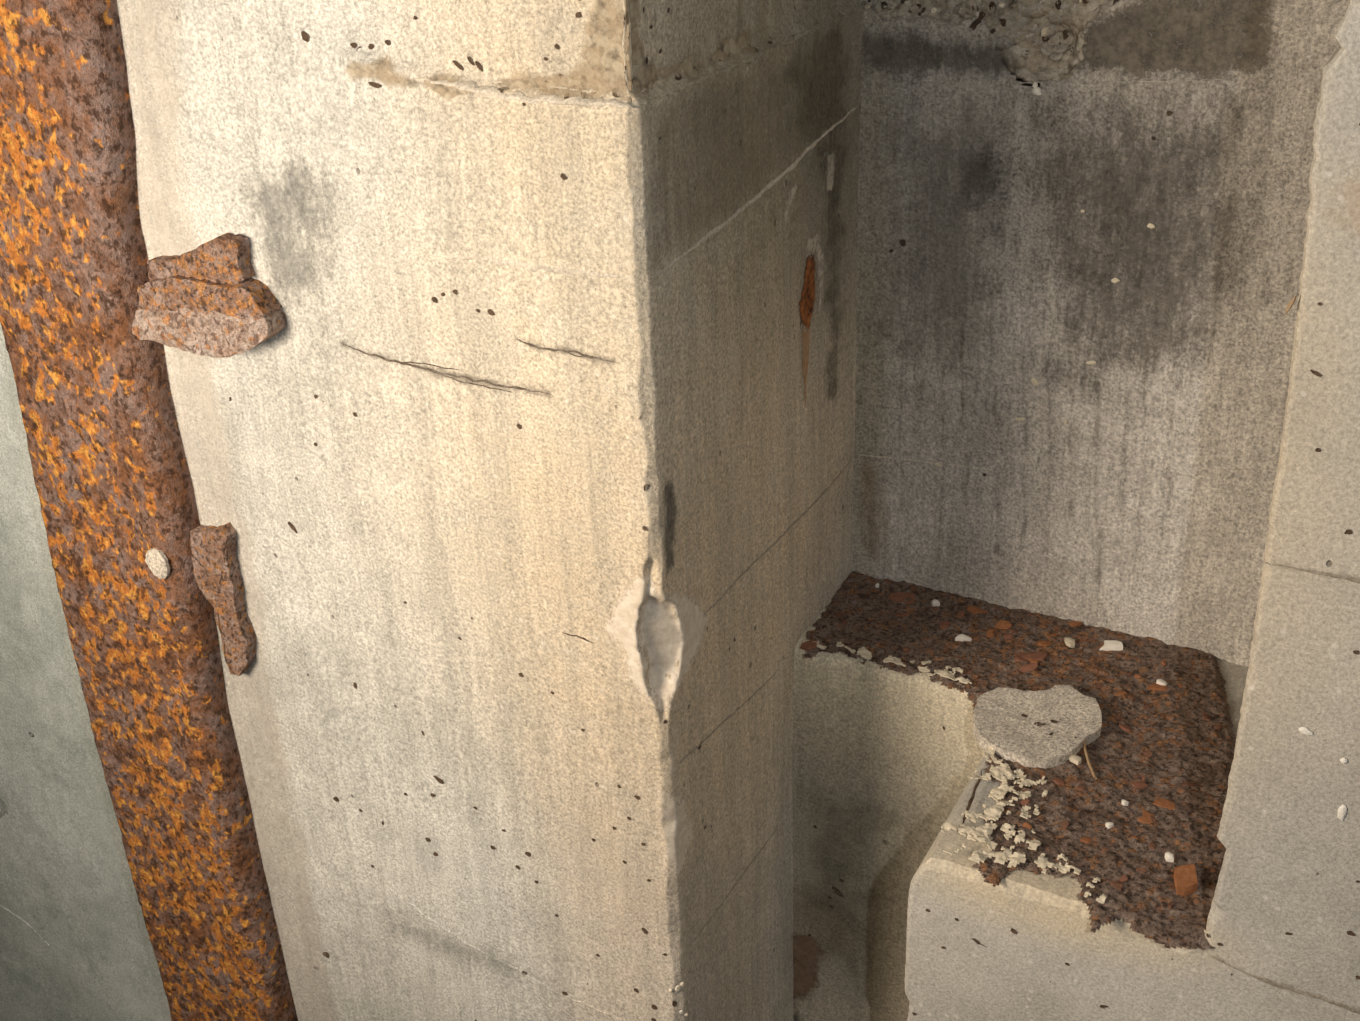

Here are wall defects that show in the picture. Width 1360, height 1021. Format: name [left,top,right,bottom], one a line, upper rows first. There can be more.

damp [862,31,1016,77]
spalling [1002,25,1087,96]
damp [1075,0,1276,81]
damp [1034,113,1235,391]
crack [341,343,550,395]
crack [515,338,615,363]
rust [799,234,824,399]
spalling [605,566,708,724]
rust [800,571,1236,950]
spalling [660,790,712,874]